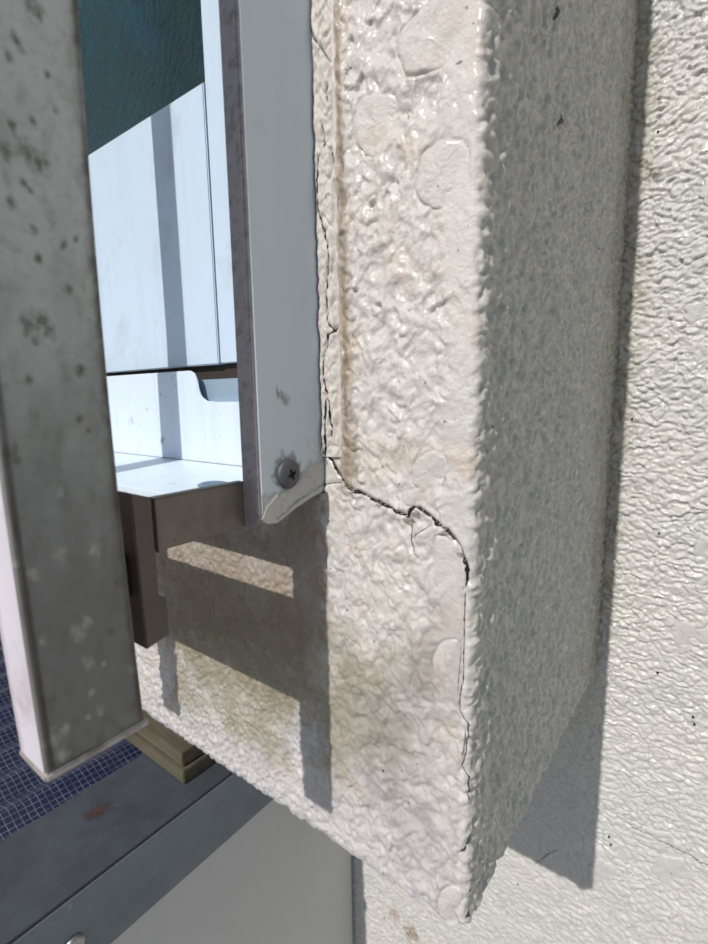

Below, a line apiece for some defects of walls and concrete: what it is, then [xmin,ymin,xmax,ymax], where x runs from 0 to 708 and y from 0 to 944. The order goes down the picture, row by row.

crack [312,31,470,802]
crack [613,813,707,865]